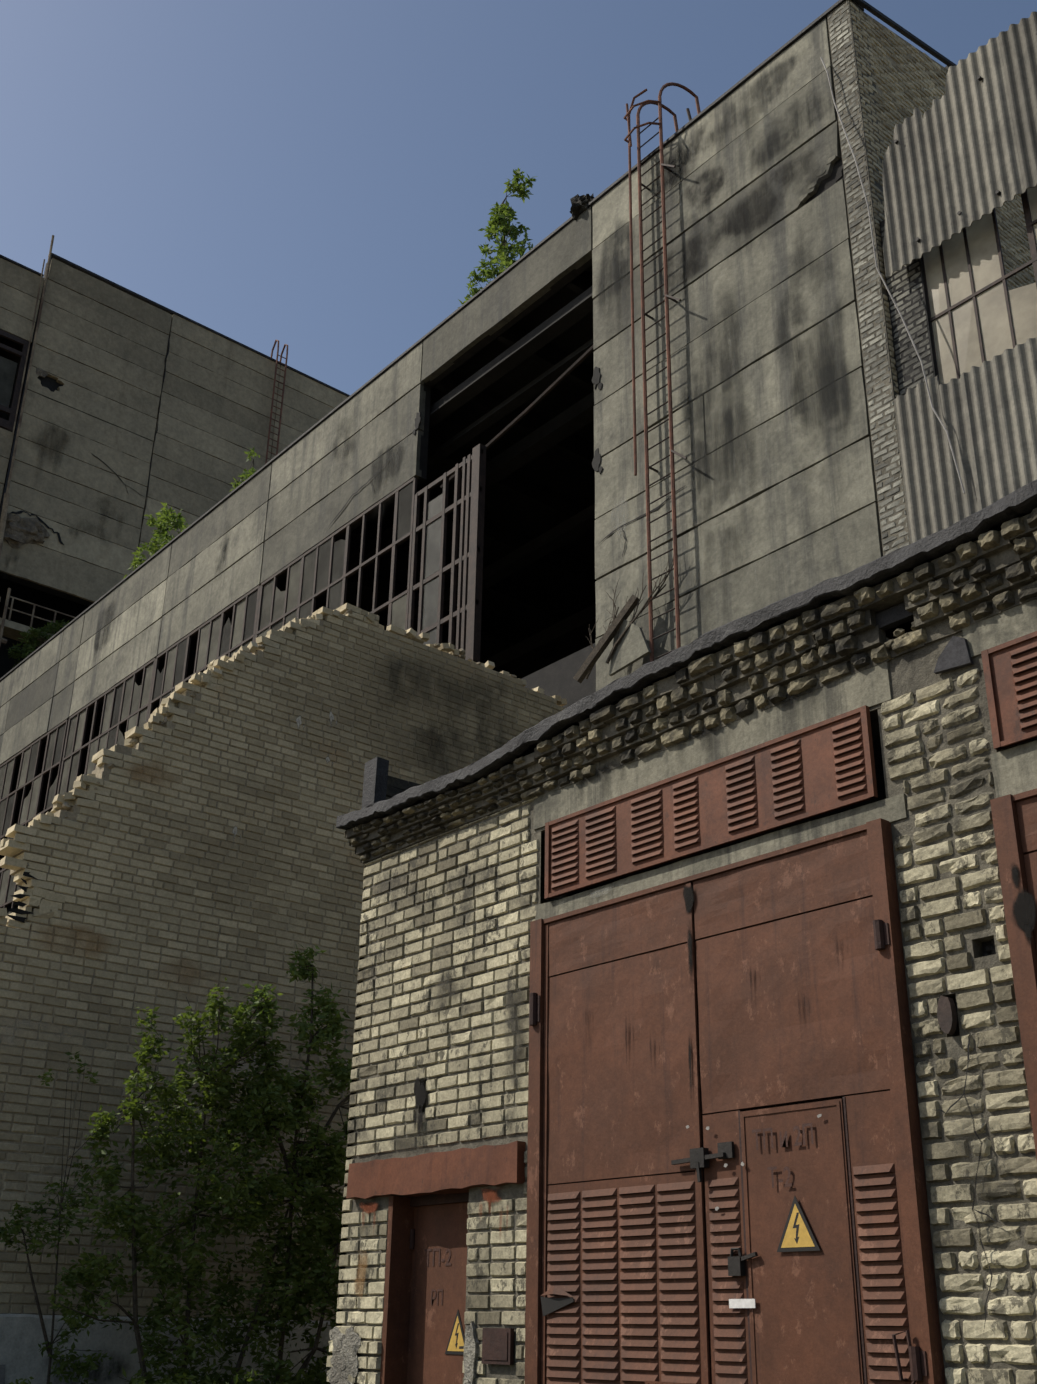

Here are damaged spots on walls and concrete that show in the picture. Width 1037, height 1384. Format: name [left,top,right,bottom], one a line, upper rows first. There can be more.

damp [725,133,792,233]
hole [36,368,61,392]
crack [92,333,171,524]
damp [684,307,745,482]
damp [780,307,849,415]
spalling [4,513,50,548]
spalling [7,872,37,923]
damp [414,1110,423,1136]